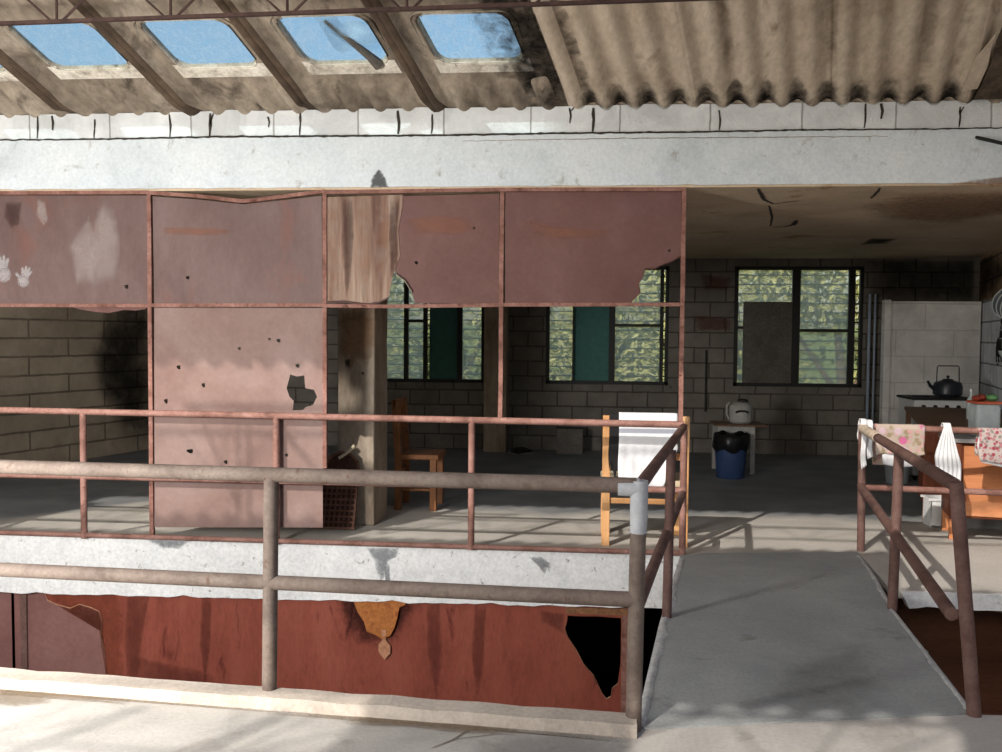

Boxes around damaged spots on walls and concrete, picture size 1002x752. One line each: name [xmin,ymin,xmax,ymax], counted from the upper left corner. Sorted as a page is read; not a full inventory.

water stain [476,0,564,94]
peeling [962,34,996,91]
crack [757,189,799,227]
corrosion [45,593,263,686]
corrosion [277,599,622,712]